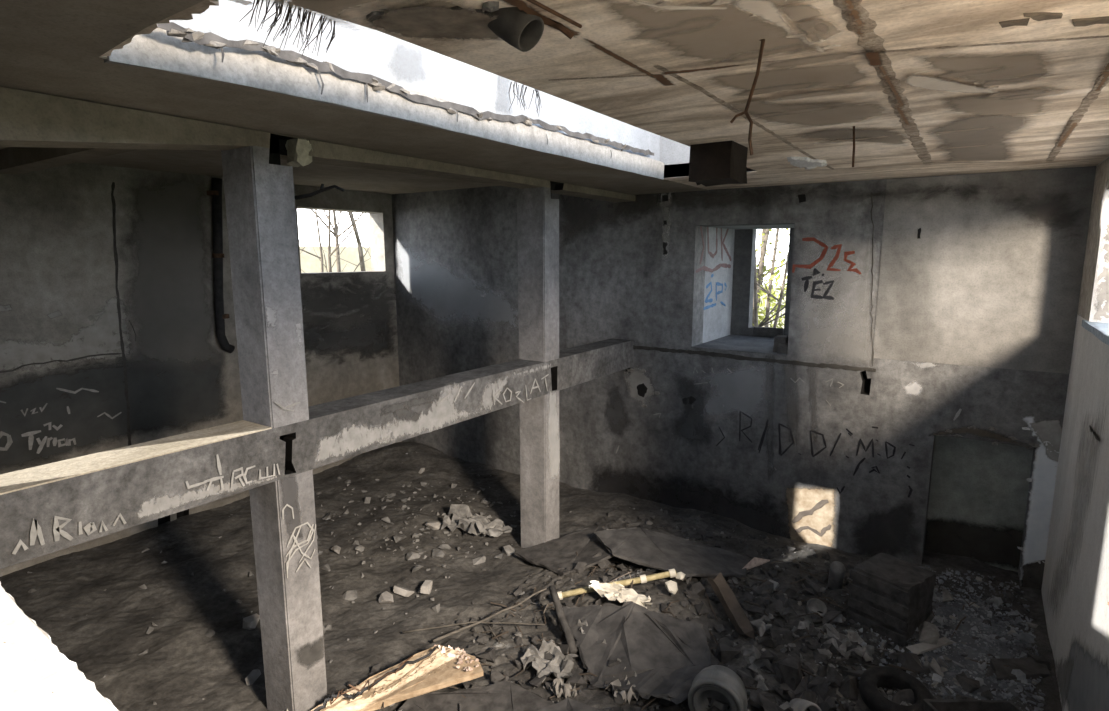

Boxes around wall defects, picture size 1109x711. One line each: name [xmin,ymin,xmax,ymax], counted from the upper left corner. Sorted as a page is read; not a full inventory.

water stain [270,0,378,24]
spalling [366,1,501,40]
water stain [610,0,907,145]
peeling [907,71,999,93]
corrosion [1095,63,1109,91]
water stain [924,54,1065,161]
corrosion [1057,123,1077,147]
peeling [1094,180,1109,322]
peeling [315,364,551,462]